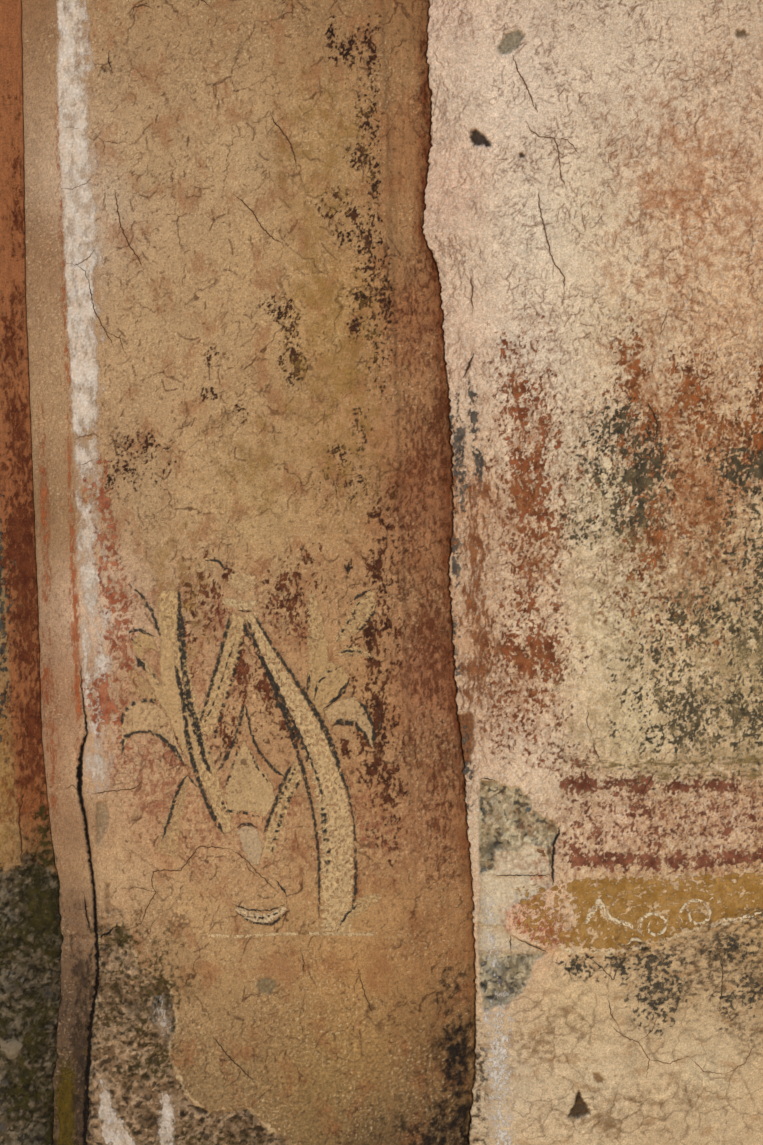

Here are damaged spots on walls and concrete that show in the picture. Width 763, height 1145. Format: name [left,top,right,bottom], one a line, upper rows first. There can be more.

crack [68,249,126,354]
crack [115,194,144,270]
water stain [449,381,485,588]
water stain [560,397,687,550]
water stain [605,432,763,782]
water stain [462,726,474,809]
crack [496,825,561,884]
flaking render [478,779,763,1012]
peeling [626,766,761,822]
flaking render [0,852,63,1145]
flaking render [87,883,294,1145]
crack [569,958,754,1077]